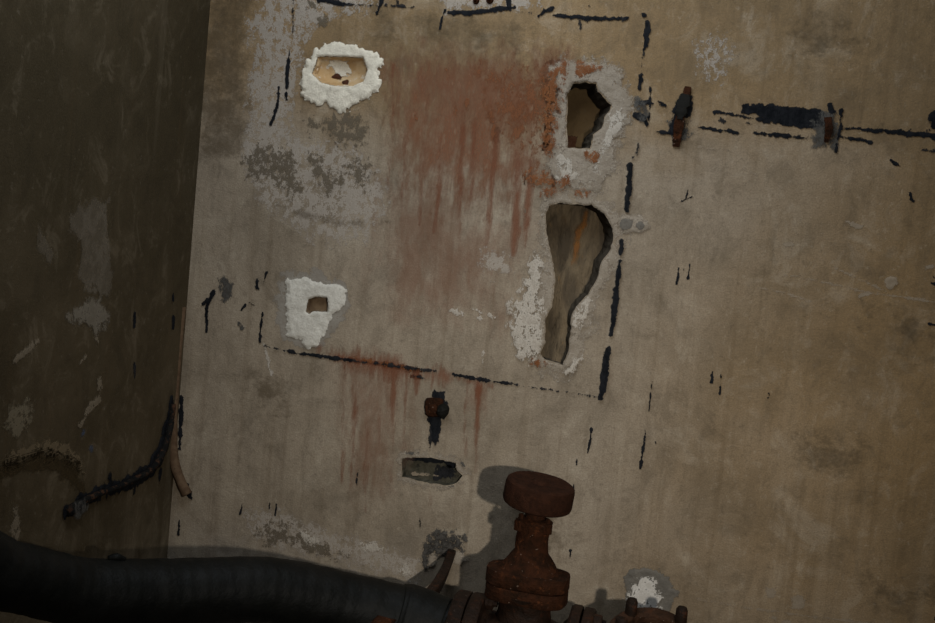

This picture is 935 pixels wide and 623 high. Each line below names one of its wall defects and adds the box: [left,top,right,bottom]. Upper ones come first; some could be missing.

spalling [505,55,637,383]